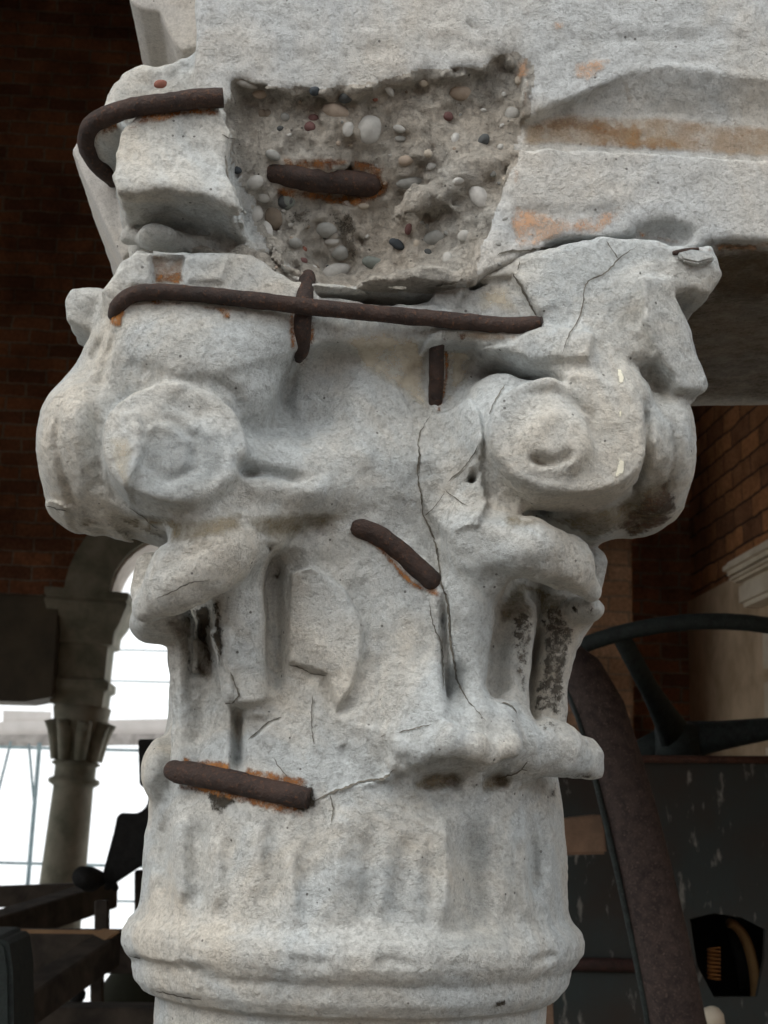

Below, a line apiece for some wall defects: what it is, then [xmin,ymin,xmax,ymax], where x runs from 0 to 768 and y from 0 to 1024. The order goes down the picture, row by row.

corrosion [131,108,216,128]
spalling [77,51,544,363]
corrosion [278,159,388,205]
crack [563,242,636,351]
crack [417,419,517,719]
corrosion [181,786,297,811]
corrosion [246,769,304,785]
crack [315,770,393,822]